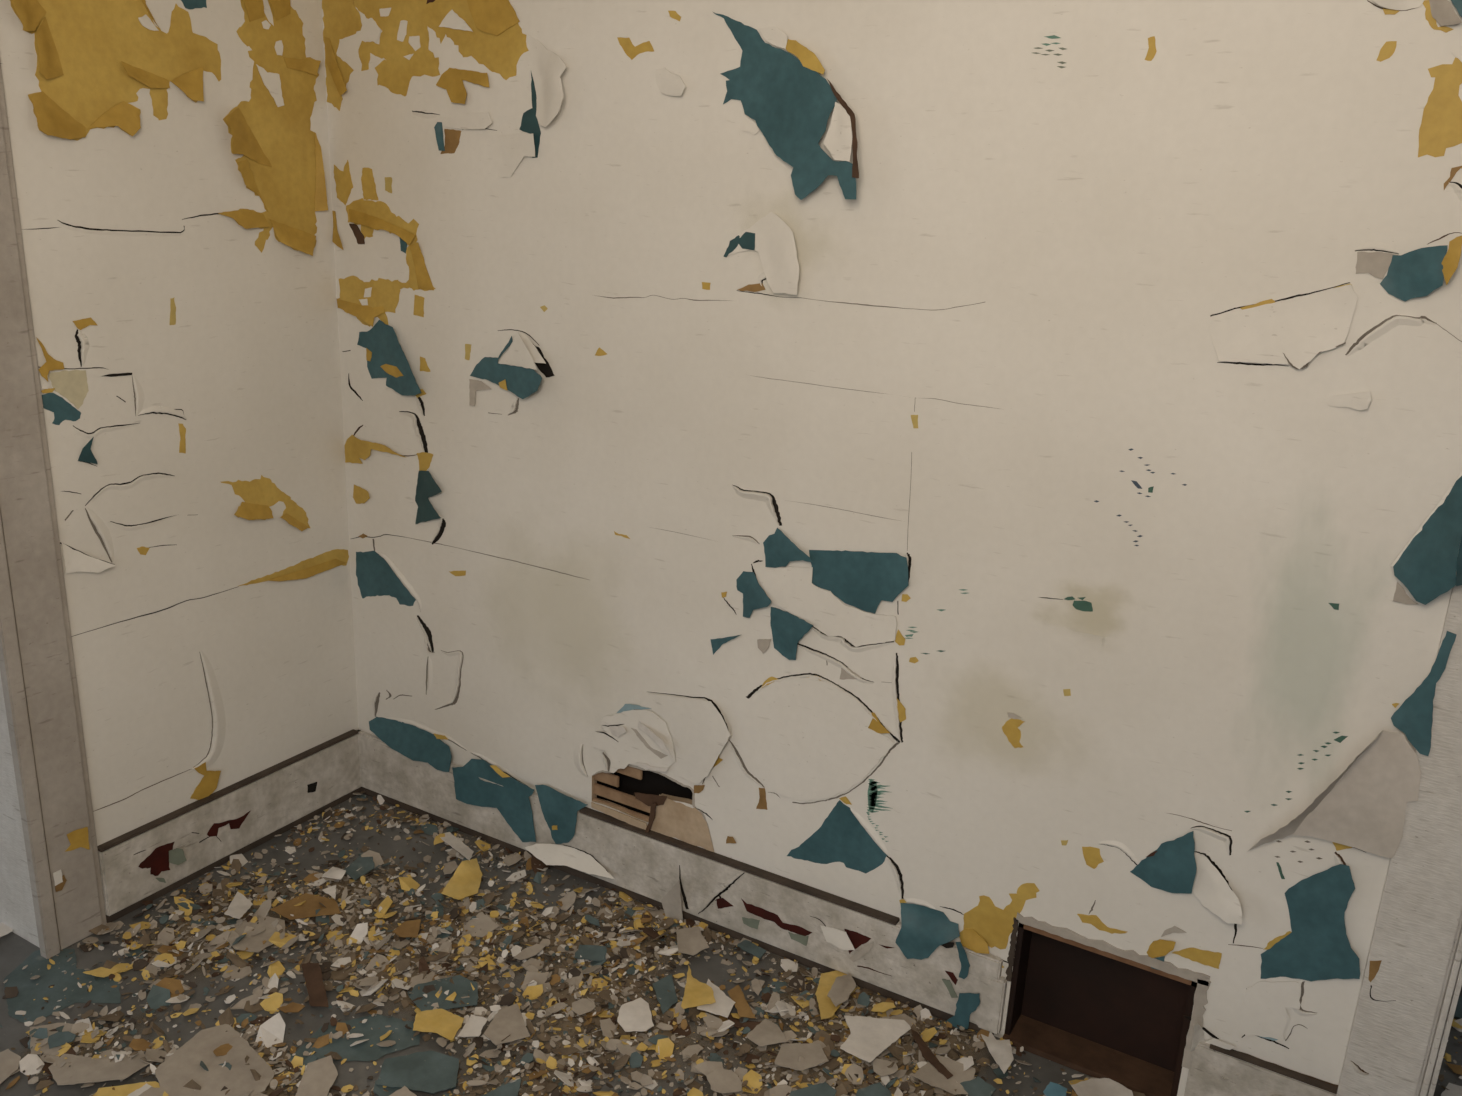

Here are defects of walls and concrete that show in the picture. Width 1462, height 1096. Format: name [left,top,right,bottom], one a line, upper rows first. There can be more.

peeling [10,0,221,141]
peeling [713,12,859,200]
peeling [1418,52,1462,190]
peeling [218,0,567,416]
peeling [36,317,145,425]
crack [1210,282,1350,317]
crack [1217,315,1462,369]
crack [60,406,187,565]
peeling [721,485,918,684]
spalling [591,764,736,852]
crack [728,653,906,810]
peeling [1260,842,1396,1001]